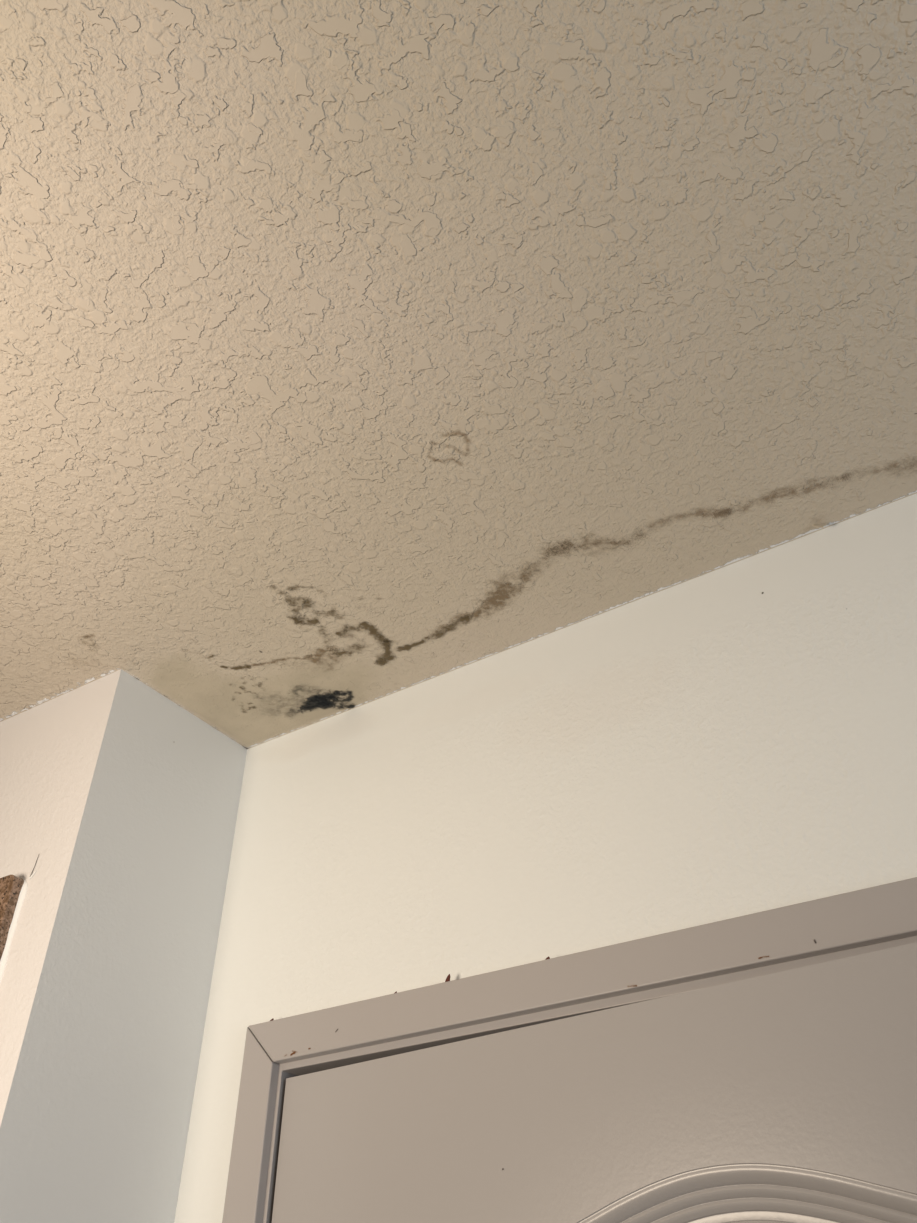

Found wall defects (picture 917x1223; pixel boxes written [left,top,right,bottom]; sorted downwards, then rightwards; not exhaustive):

water stain [696,506,748,517]
water stain [209,573,531,689]
water stain [290,688,355,715]